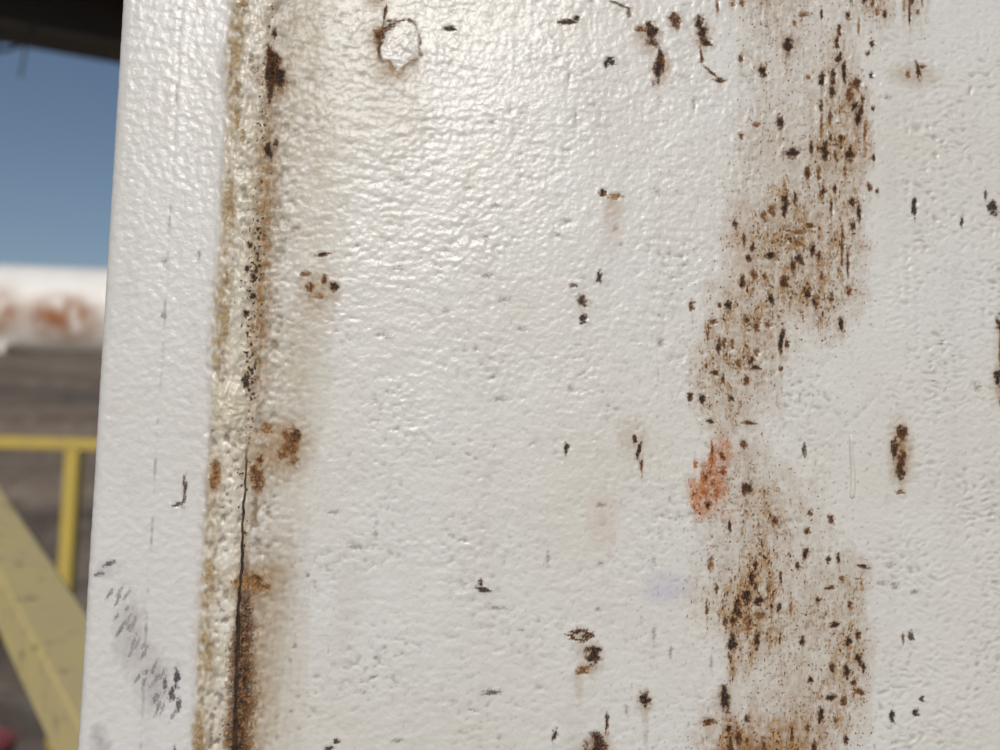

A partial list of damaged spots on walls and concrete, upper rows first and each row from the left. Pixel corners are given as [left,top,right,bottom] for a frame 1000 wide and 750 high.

corrosion [668,12,681,30]
corrosion [265,43,288,104]
corrosion [635,21,665,85]
corrosion [300,272,339,299]
corrosion [687,0,924,750]
corrosion [209,462,220,490]
corrosion [249,423,302,491]
crack [223,459,257,750]
corrosion [231,571,272,594]
corrosion [583,714,609,750]